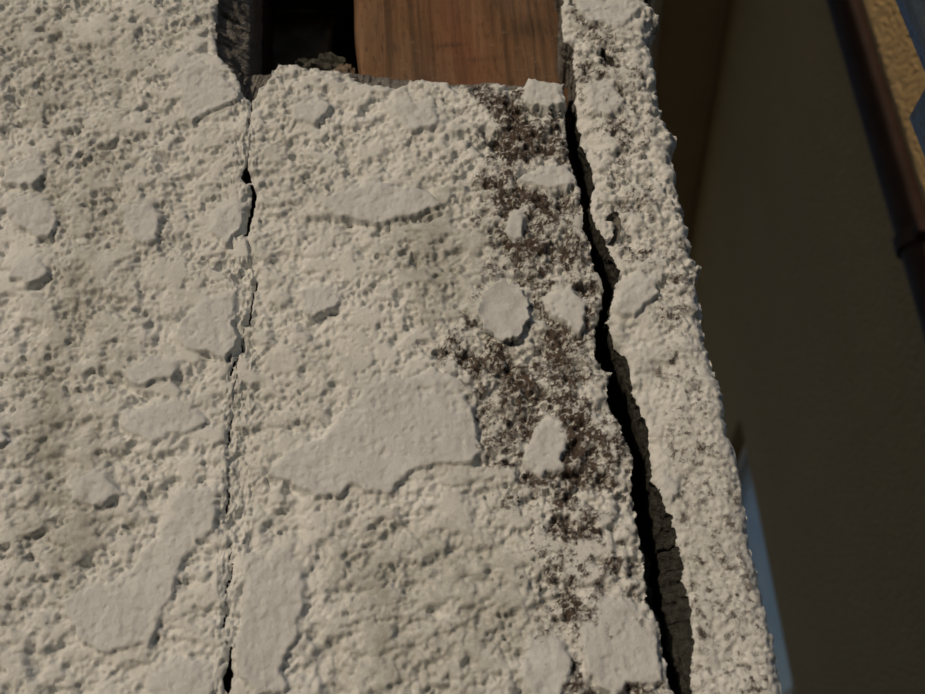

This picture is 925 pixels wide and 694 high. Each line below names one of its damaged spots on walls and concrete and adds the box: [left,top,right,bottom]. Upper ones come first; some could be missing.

spalling [215,0,272,102]
crack [241,154,257,248]
spalling [341,72,413,89]
spalling [554,0,577,144]
damp [566,4,688,273]
crack [227,282,258,446]
damp [438,83,641,638]
crack [564,108,695,694]
crack [223,472,234,694]
damp [564,656,596,694]
damp [621,683,666,694]